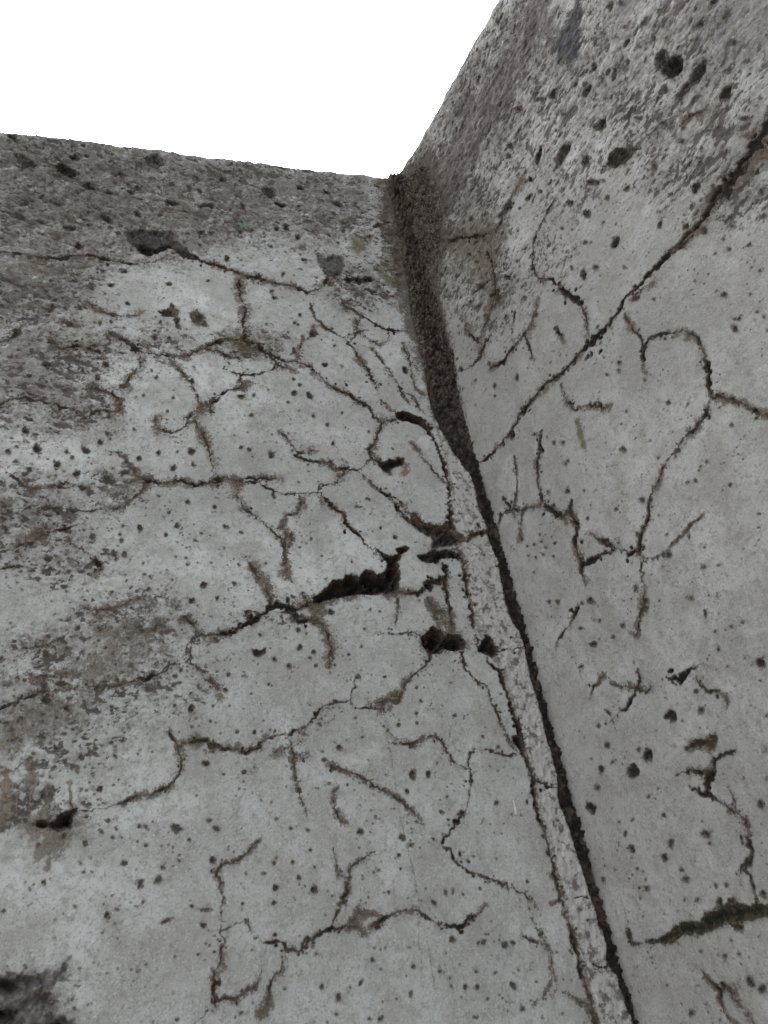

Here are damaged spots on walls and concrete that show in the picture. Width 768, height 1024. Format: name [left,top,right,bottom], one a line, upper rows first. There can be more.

spalling [134,242,195,260]
crack [444,120,768,647]
spalling [313,512,489,615]
crack [0,249,609,1024]
spalling [421,626,498,657]
crack [588,667,730,717]
crack [675,750,760,904]
spalling [0,978,47,1024]
spalling [34,1016,69,1024]
crack [702,970,754,1024]